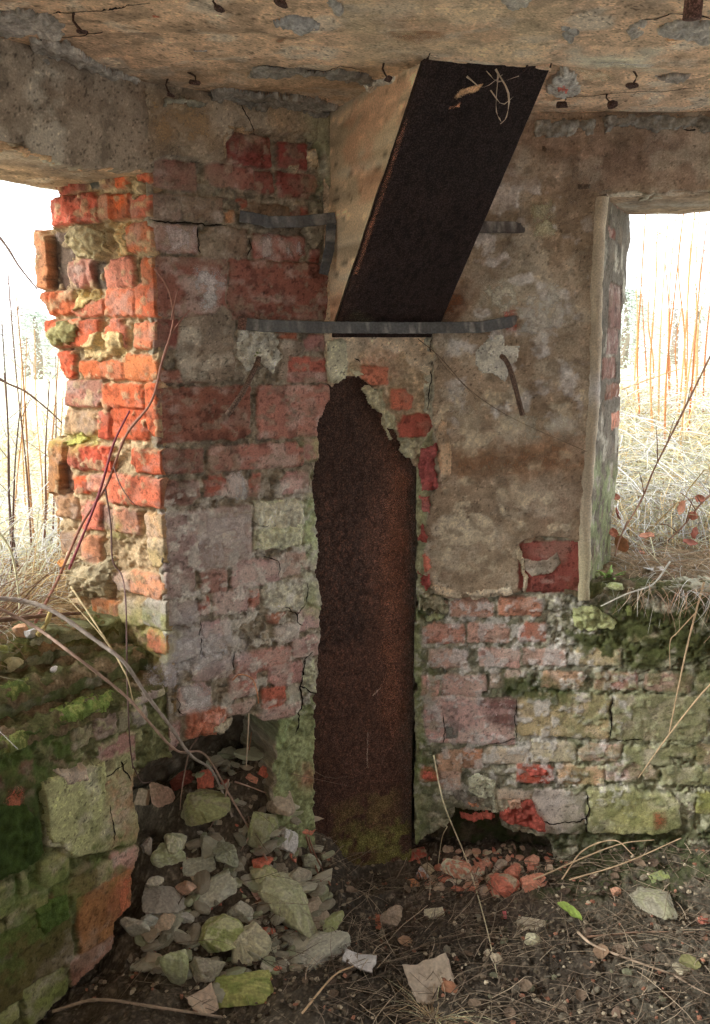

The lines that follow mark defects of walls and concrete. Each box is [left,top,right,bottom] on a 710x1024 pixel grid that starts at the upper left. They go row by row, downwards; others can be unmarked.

spalling [0,7,141,85]
spalling [545,66,581,99]
spalling [163,65,395,173]
spalling [50,194,99,224]
crack [150,219,227,252]
spalling [326,338,579,621]
spalling [252,498,304,550]
crack [285,585,309,625]
spalling [460,798,546,832]